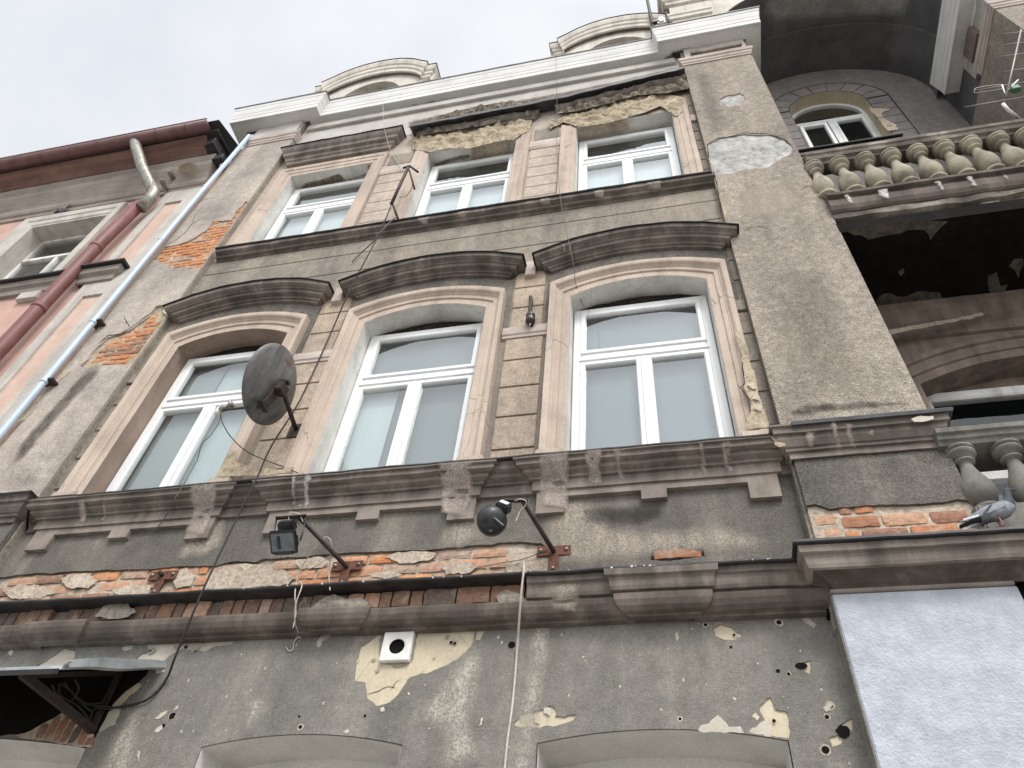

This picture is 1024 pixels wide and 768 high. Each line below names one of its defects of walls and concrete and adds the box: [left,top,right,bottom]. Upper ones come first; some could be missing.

flaking render [412,100,542,160]
flaking render [548,76,689,141]
flaking render [156,204,246,269]
peeling [876,291,942,306]
peeling [890,313,984,334]
flaking render [16,307,166,423]
flaking render [734,328,786,447]
flaking render [808,501,978,538]
flaking render [0,544,549,601]
peeling [355,631,485,712]
peeling [515,706,575,728]
peeling [698,698,790,738]